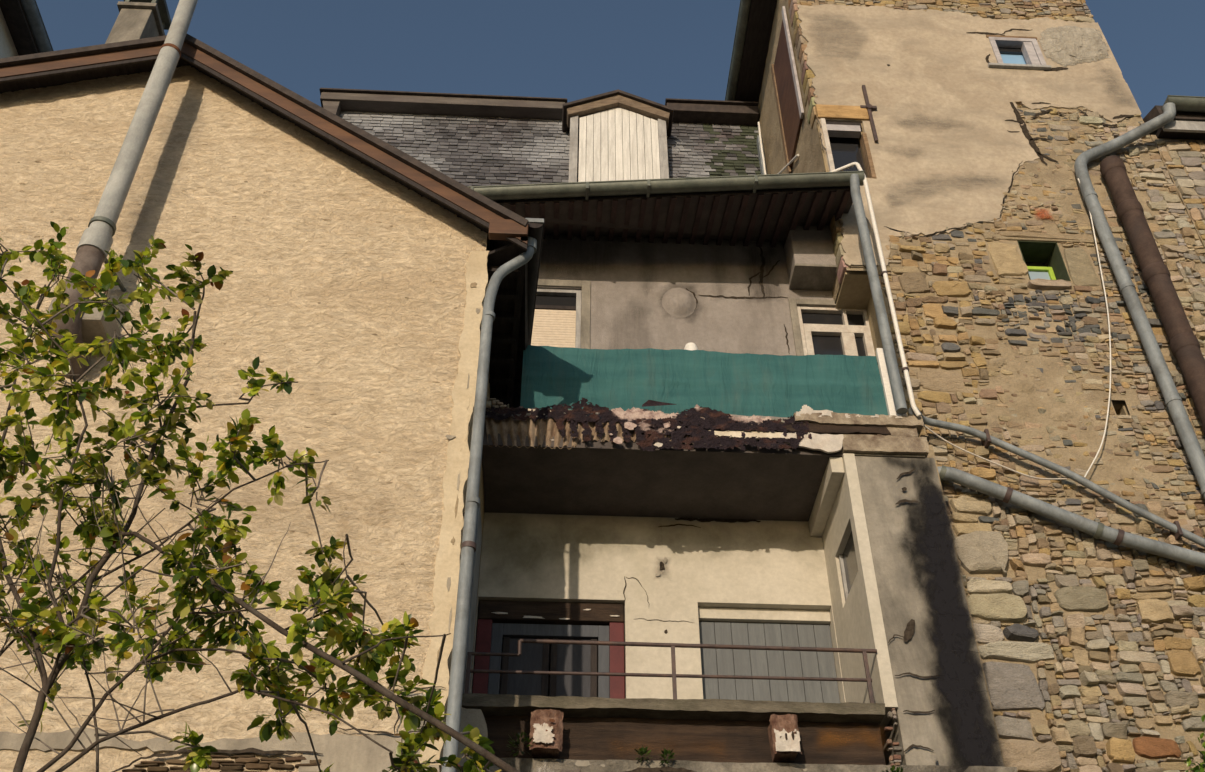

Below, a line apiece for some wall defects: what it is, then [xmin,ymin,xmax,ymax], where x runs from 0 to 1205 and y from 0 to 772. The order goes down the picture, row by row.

crack [1005,102,1134,165]
crack [699,247,790,354]
spalling [485,398,844,453]
crack [623,576,692,623]
leakage [887,456,1002,772]